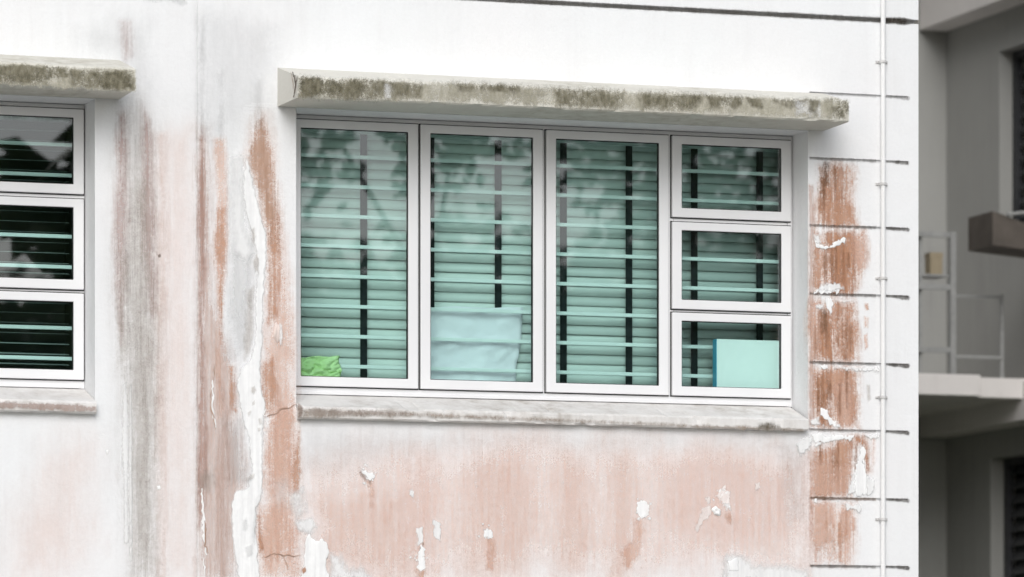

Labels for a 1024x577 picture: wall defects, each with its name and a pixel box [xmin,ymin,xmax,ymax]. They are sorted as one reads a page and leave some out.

corrosion [215,194,226,276]
peeling [814,234,846,249]
corrosion [810,164,866,427]
peeling [230,157,267,577]
corrosion [250,123,300,575]
peeling [292,486,369,577]
spalling [409,520,441,577]
spalling [624,499,651,567]
peeling [796,408,879,513]
corrosion [811,436,868,562]